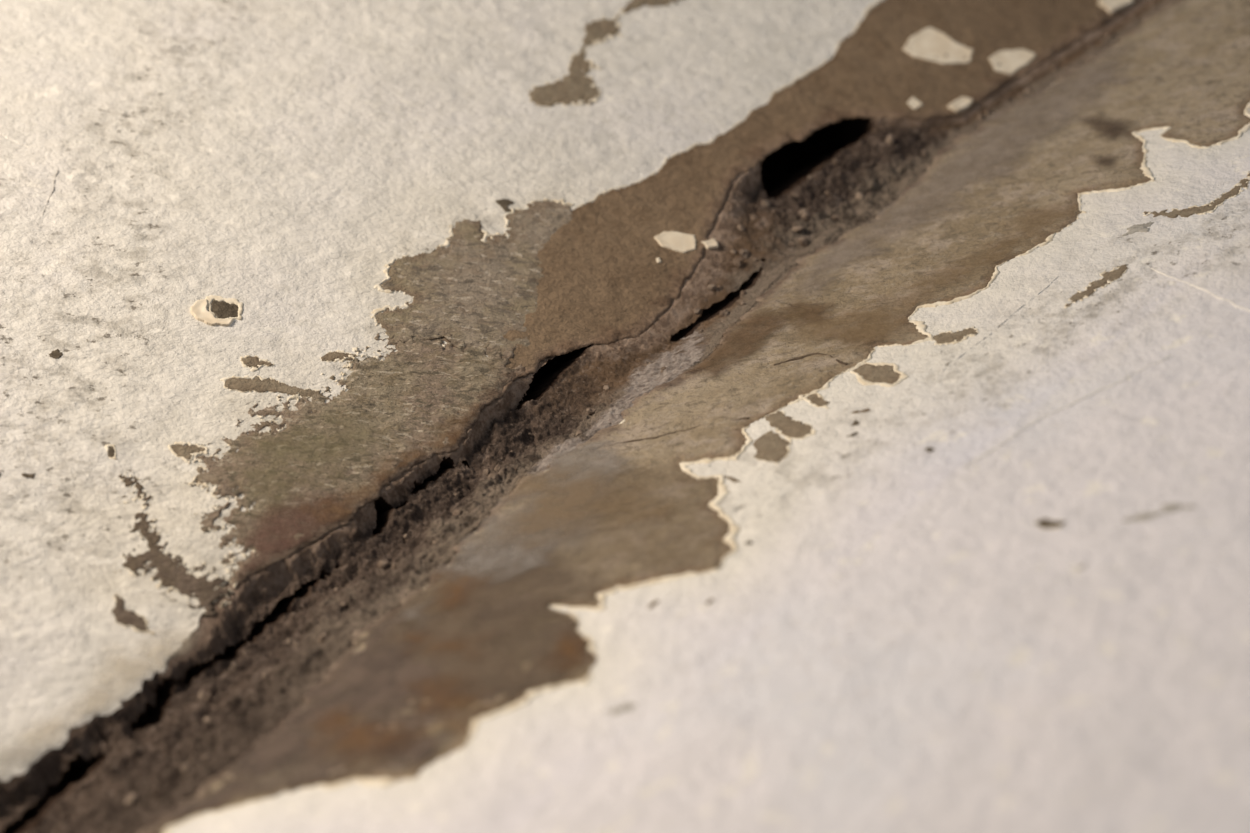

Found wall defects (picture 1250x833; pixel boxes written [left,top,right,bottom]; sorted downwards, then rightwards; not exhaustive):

water stain [1089,117,1125,136]
peeling [168,0,1250,685]
crack [773,353,848,366]
peeling [105,444,117,460]
peeling [111,594,155,635]
peeling [114,472,233,617]
crack [0,258,766,833]
water stain [146,303,828,833]
peeling [137,608,598,833]